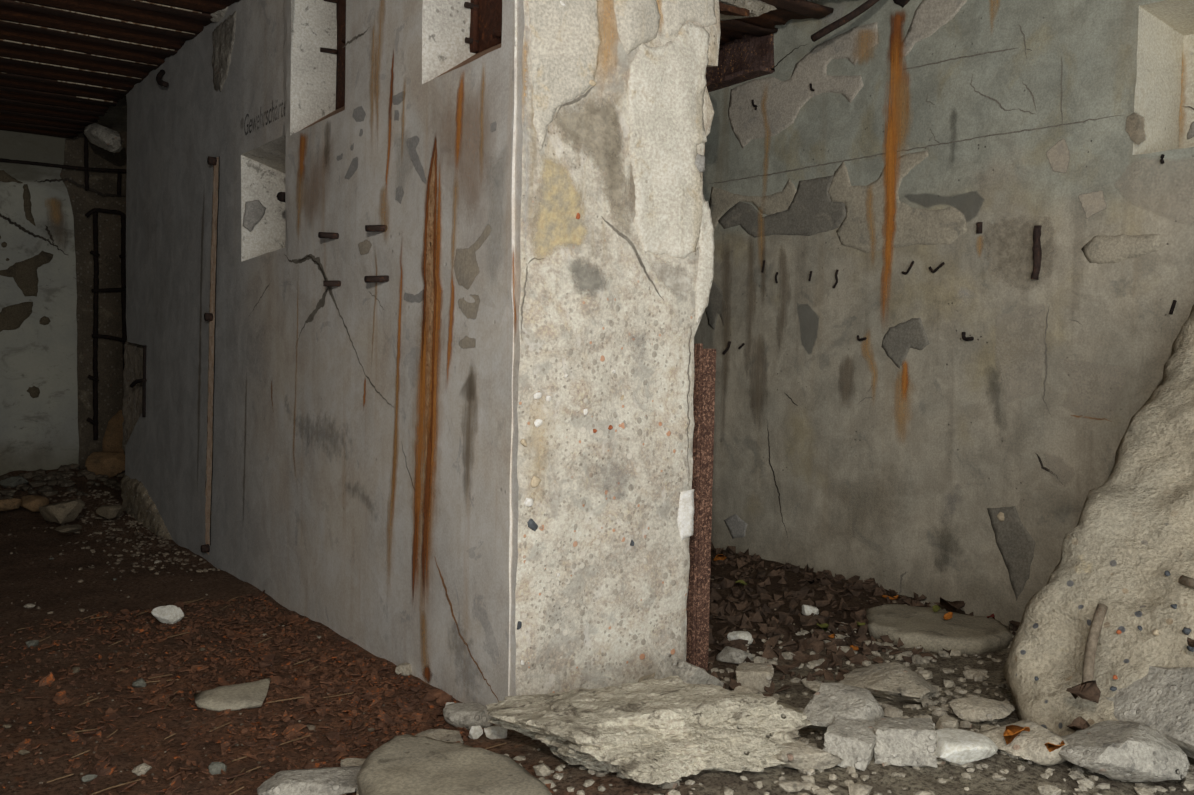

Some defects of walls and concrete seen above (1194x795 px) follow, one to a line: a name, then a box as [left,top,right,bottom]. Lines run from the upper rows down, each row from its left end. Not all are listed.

spalling [0,134,127,226]
rust [456,78,464,161]
flaking render [527,0,1054,330]
rust [868,13,908,312]
crack [0,213,67,255]
peeling [0,236,53,332]
spalling [85,208,147,455]
crack [248,254,392,406]
rust [412,138,456,595]
peeling [798,305,819,353]
peeling [881,318,930,369]
rust [422,616,431,683]